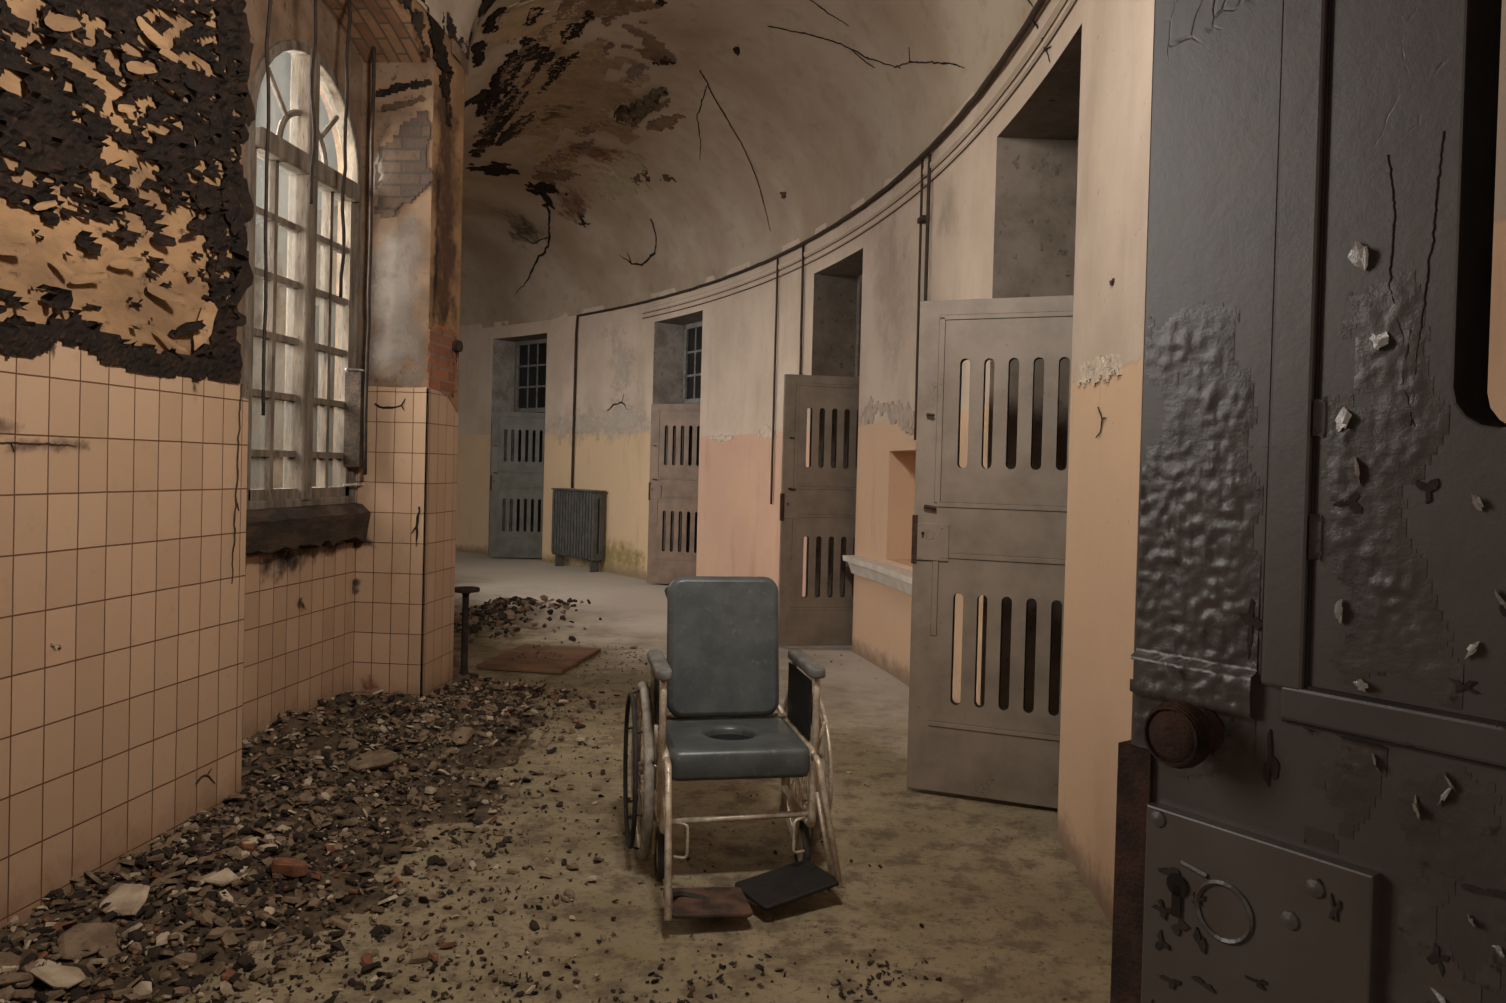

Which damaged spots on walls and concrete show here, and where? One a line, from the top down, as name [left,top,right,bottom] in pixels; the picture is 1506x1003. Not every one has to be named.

peeling [0,0,255,384]
peeling [374,0,686,228]
crack [515,181,551,295]
crack [696,70,771,232]
crack [768,0,963,68]